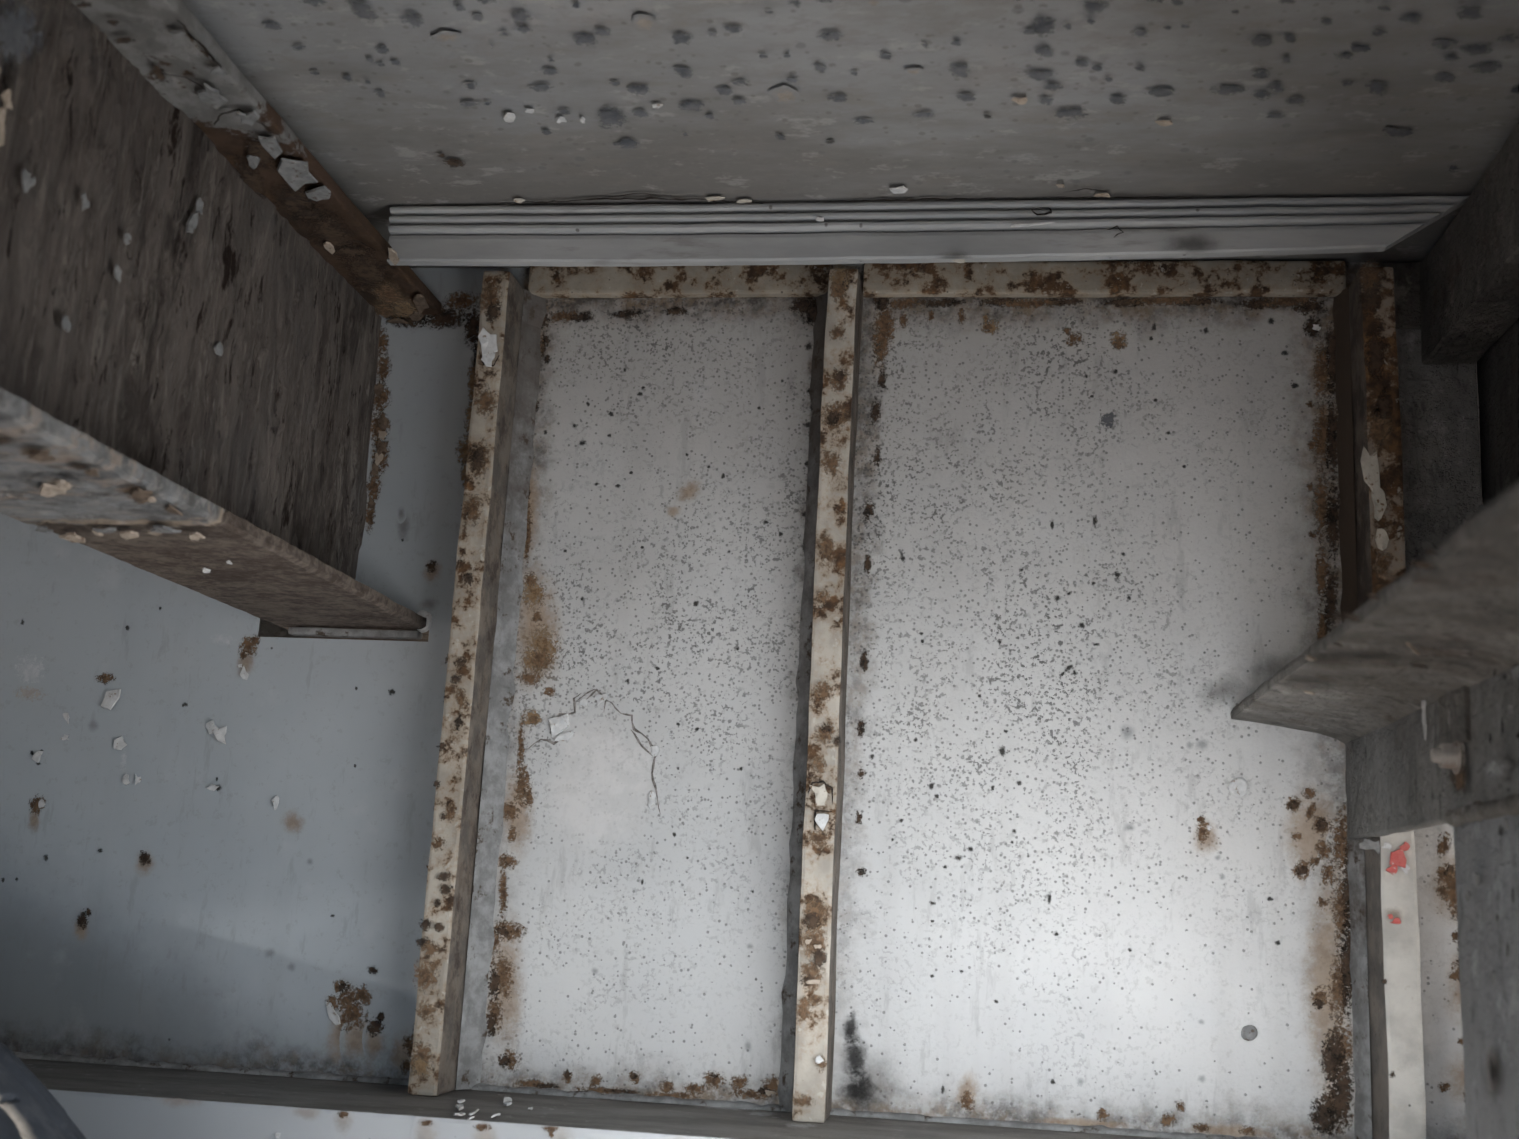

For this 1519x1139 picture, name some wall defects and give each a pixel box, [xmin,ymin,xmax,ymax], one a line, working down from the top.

peeling [81,192,90,211]
peeling [151,20,409,306]
corrosion [365,281,502,535]
corrosion [540,309,646,363]
peeling [95,672,121,710]
corrosion [485,446,812,1106]
corrosion [811,718,865,774]
corrosion [859,649,869,672]
corrosion [322,802,457,1079]
corrosion [796,899,828,1021]
corrosion [1275,771,1355,1139]
corrosion [1420,831,1466,1139]